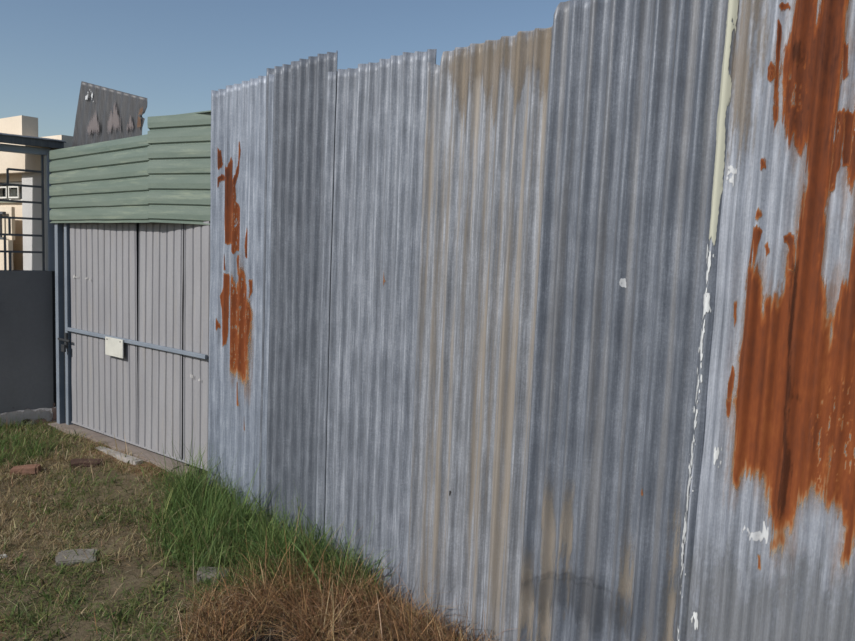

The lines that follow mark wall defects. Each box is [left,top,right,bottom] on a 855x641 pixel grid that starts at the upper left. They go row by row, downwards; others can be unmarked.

rust [216,142,253,406]
rust [726,0,855,570]